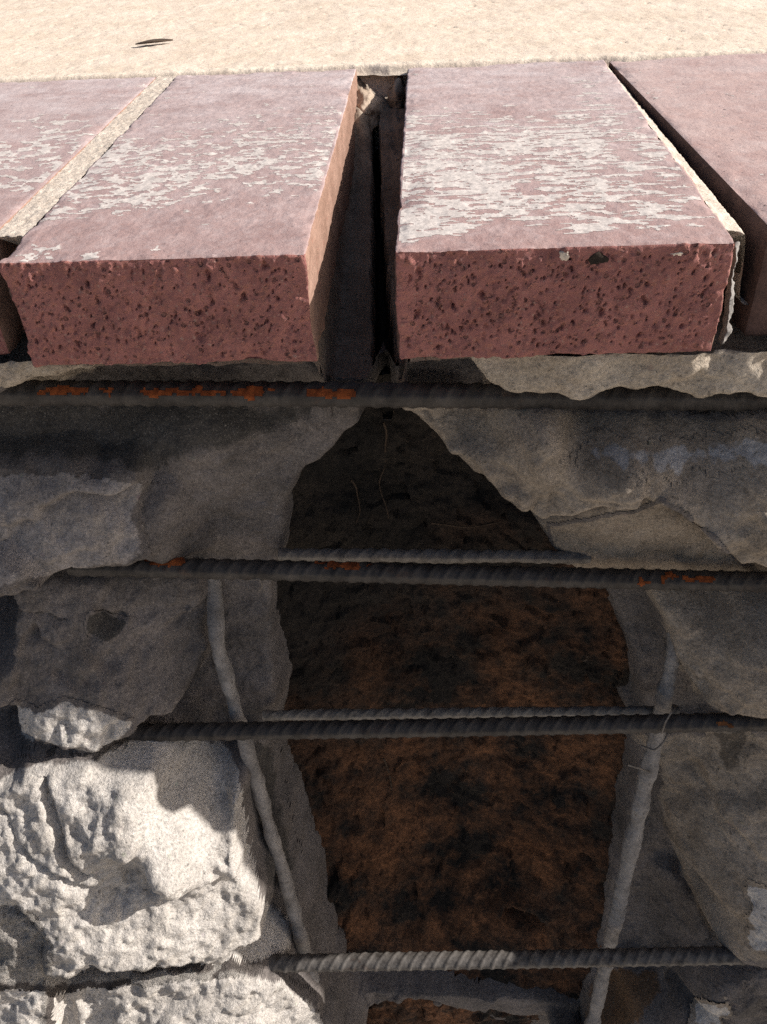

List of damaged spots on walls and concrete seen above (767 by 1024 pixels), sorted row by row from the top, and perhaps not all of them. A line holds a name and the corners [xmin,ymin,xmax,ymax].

crack [370,125,394,374]
corrosion [37,385,114,398]
corrosion [140,385,275,401]
corrosion [307,386,356,399]
corrosion [314,560,372,570]
corrosion [637,571,715,587]
spalling [0,350,767,1024]